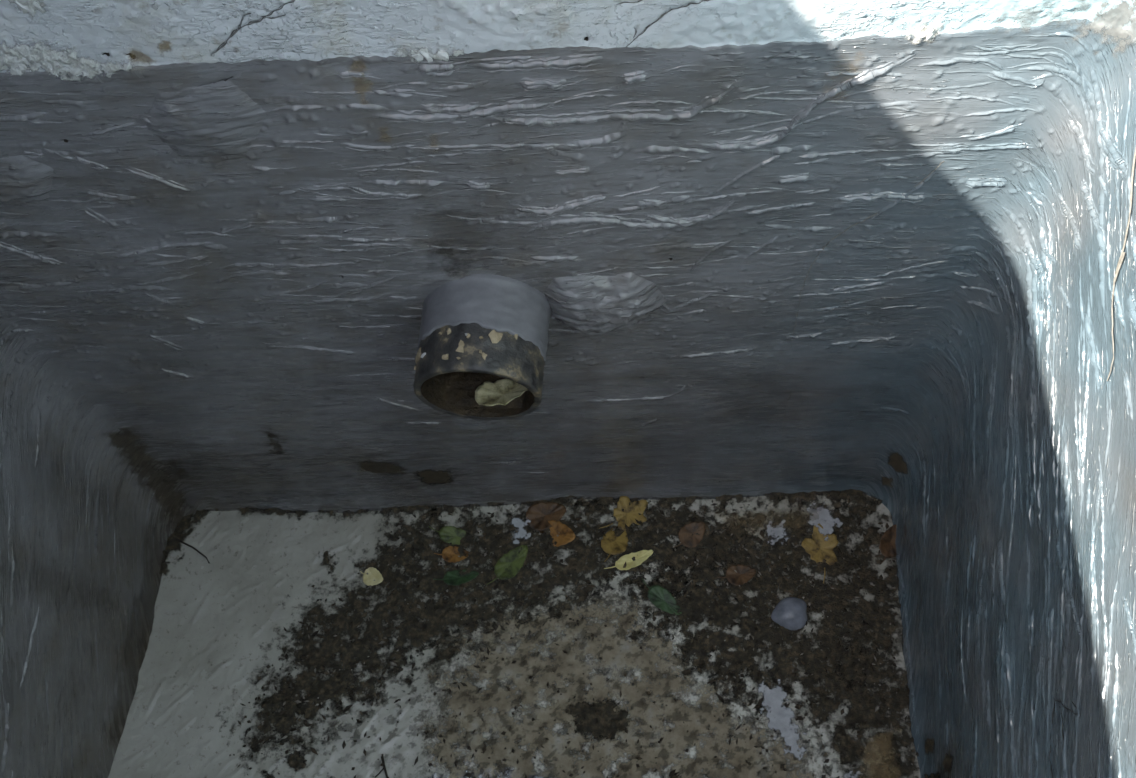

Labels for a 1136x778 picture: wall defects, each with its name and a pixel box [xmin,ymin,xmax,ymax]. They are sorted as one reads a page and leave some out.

crack [617,0,710,47]